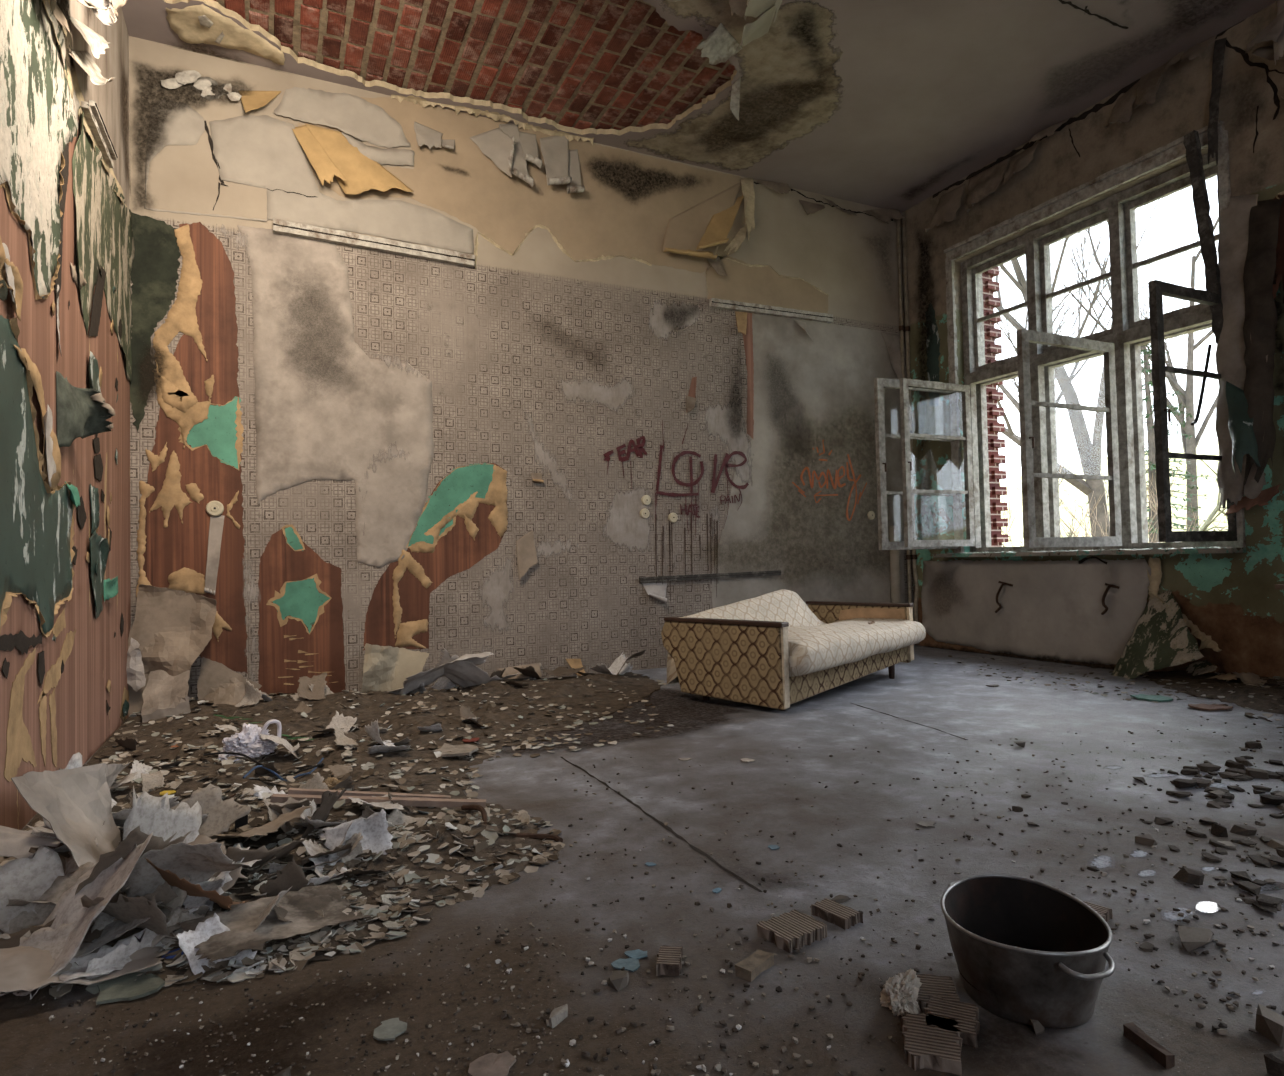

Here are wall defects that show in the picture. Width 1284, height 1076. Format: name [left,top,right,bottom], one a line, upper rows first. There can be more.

peeling [0,0,181,431]
crack [204,121,227,210]
spalling [160,0,857,276]
mould [590,160,698,201]
damp [699,85,818,153]
crack [933,79,1140,198]
crack [1058,0,1129,29]
crack [1215,10,1284,153]
peeling [1215,194,1284,515]
peeling [0,315,75,638]
peeling [204,515,224,595]
crack [561,757,763,892]